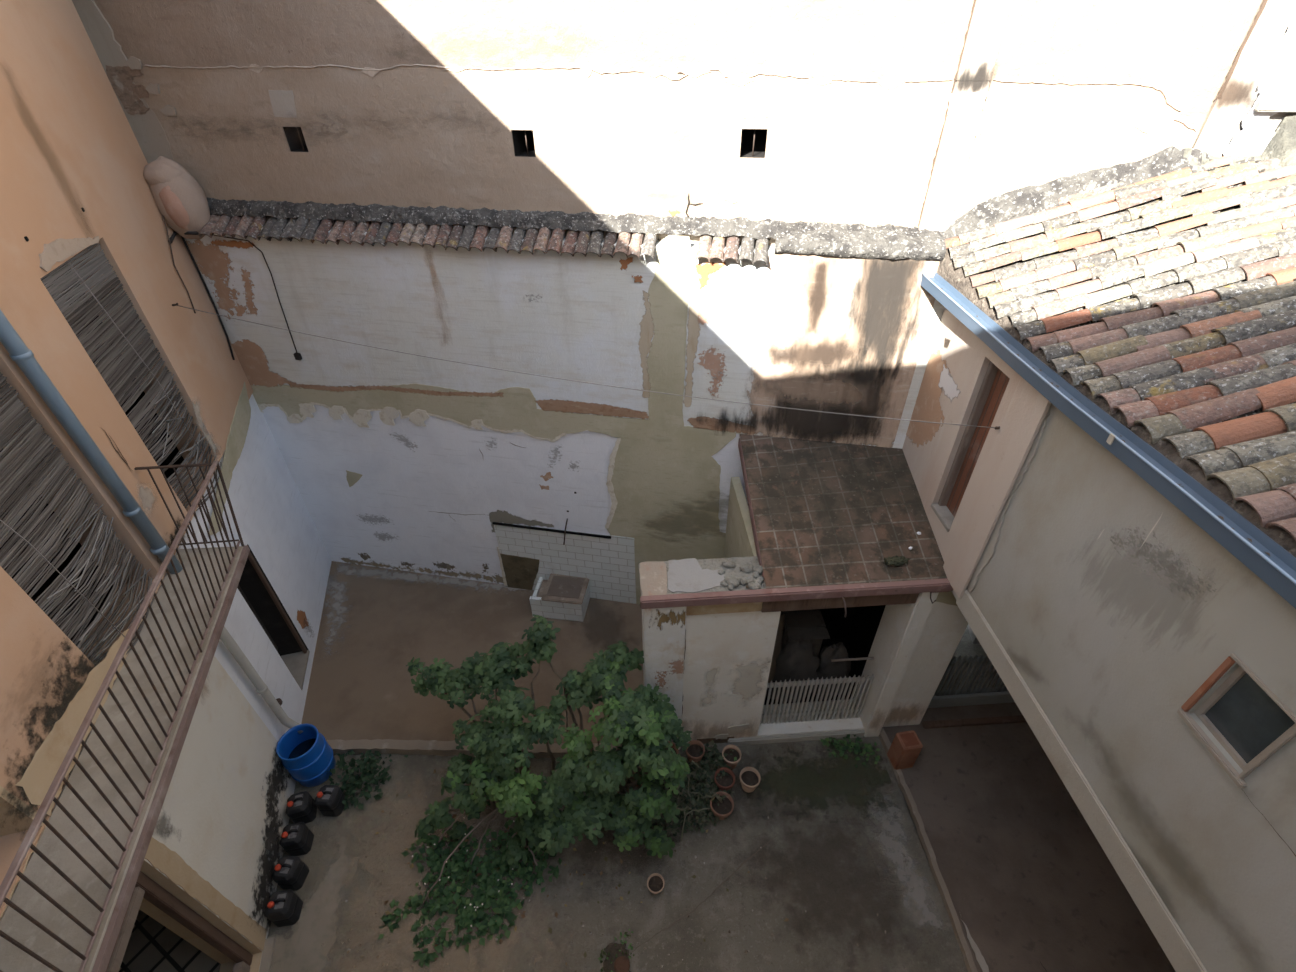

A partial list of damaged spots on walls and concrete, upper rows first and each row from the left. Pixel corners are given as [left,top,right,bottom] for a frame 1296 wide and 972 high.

peeling [106,56,953,116]
leakage [958,63,992,92]
leakage [1218,81,1253,106]
peeling [24,236,100,272]
peeling [186,239,258,321]
peeling [683,259,755,434]
leakage [717,253,940,448]
spalling [341,553,504,583]
peeling [655,659,684,689]
leakage [7,643,106,834]